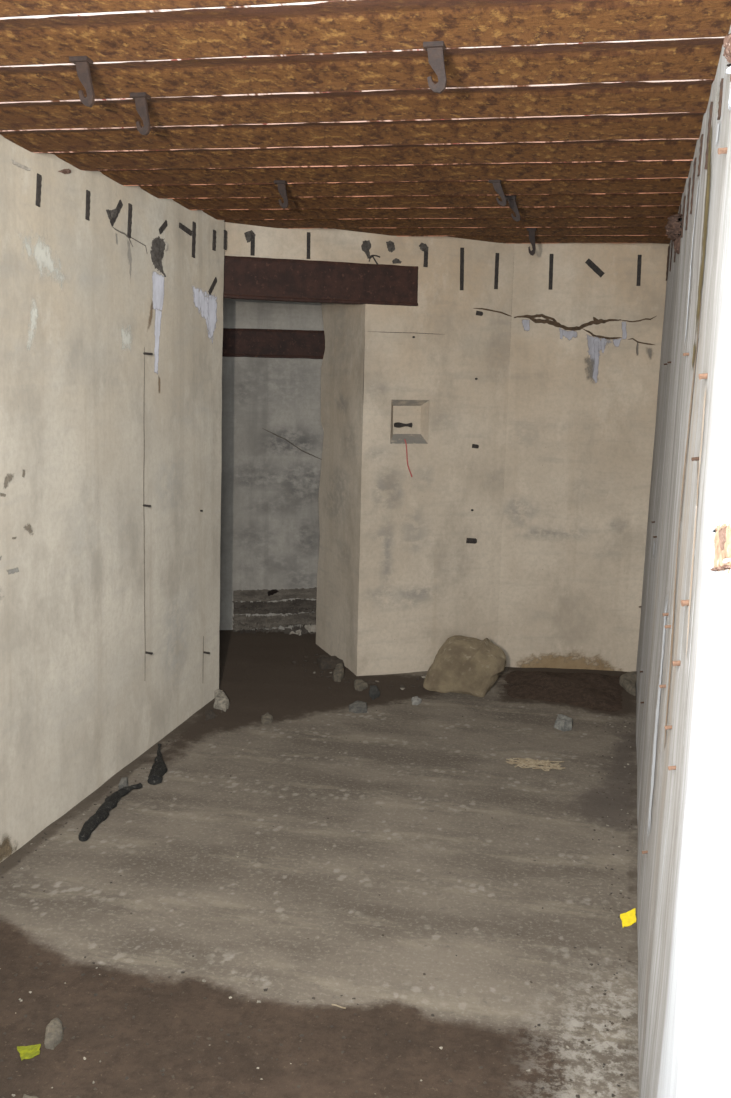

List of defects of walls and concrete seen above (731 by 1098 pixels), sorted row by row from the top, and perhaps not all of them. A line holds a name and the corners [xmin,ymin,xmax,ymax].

spalling [723,33,731,111]
crack [474,308,656,354]
spalling [706,523,731,574]